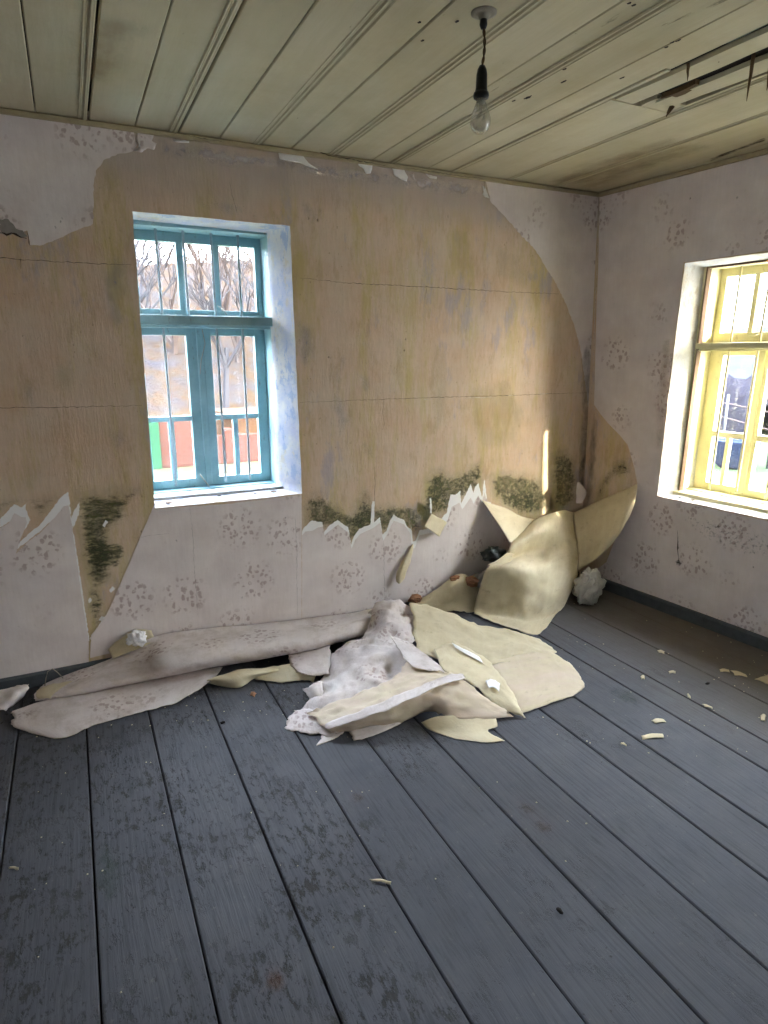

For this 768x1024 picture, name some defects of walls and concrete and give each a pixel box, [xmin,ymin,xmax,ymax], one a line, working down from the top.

peeling [278,153,317,169]
peeling [392,168,408,182]
flaking render [0,219,30,245]
mould [427,470,479,512]
mould [495,459,573,512]
mould [309,499,419,537]
mould [83,496,129,581]